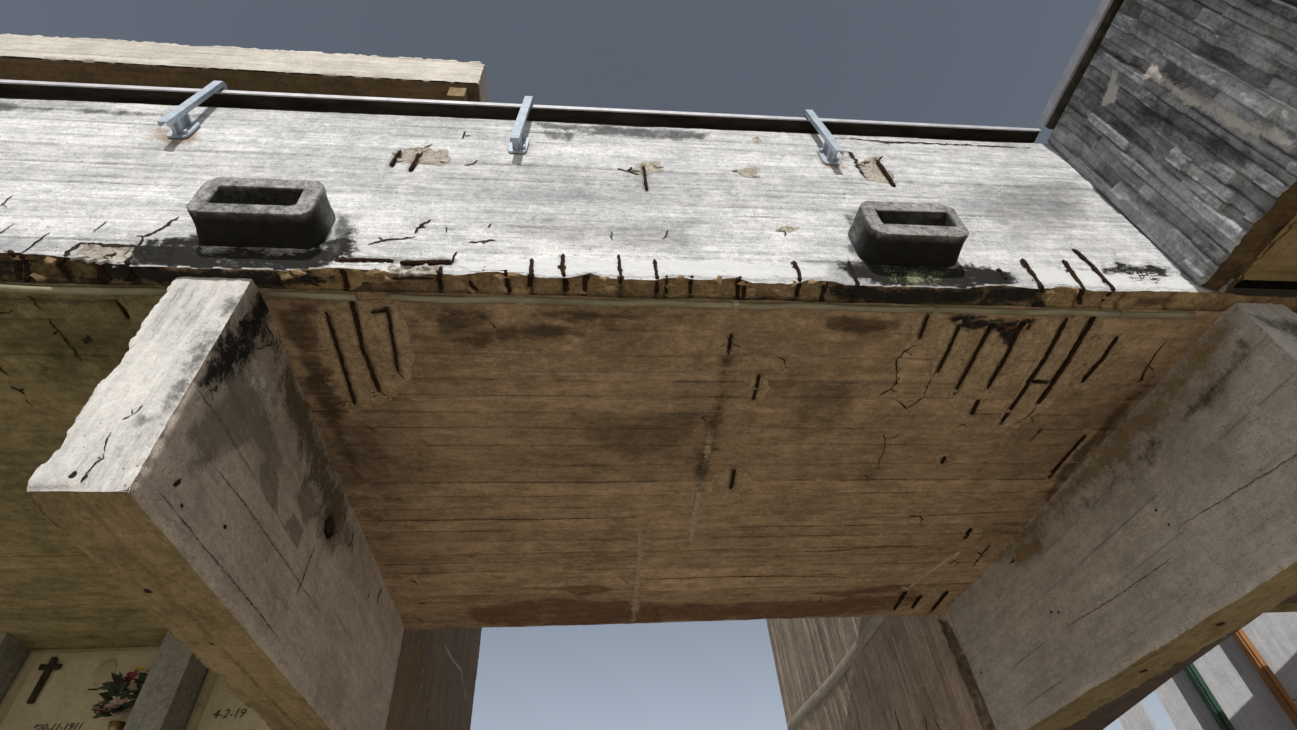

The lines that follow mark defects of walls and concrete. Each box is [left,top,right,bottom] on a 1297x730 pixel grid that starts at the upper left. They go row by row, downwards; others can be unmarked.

spalling [389,147,451,172]
spalling [630,161,664,190]
spalling [732,167,760,178]
spalling [856,157,896,187]
water stain [1101,261,1170,283]
spalling [0,181,1297,436]
water stain [819,244,1045,346]
water stain [102,216,361,477]
crack [864,344,934,482]